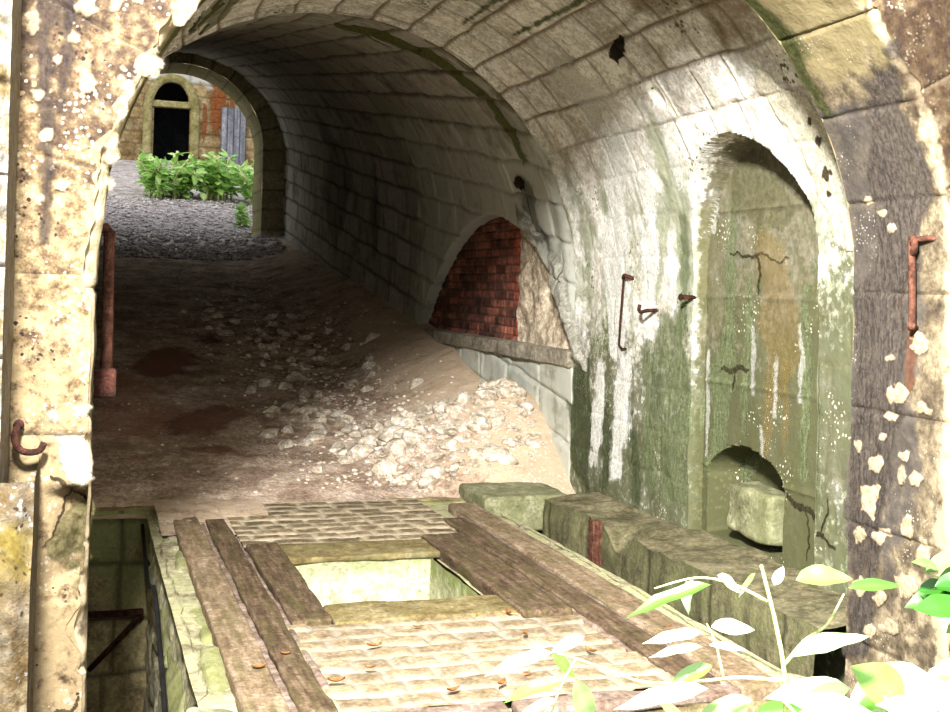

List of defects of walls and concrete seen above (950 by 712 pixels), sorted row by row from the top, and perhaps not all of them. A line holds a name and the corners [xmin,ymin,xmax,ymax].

spalling [173,0,199,25]
spalling [113,49,163,119]
water stain [36,0,80,243]
spalling [106,133,119,163]
peeling [864,196,897,233]
peeling [909,331,929,355]
peeling [884,383,909,421]
peeling [916,401,932,415]
peeling [853,440,930,559]
spalling [47,433,156,712]
peeling [852,575,887,607]
peeling [863,617,898,639]